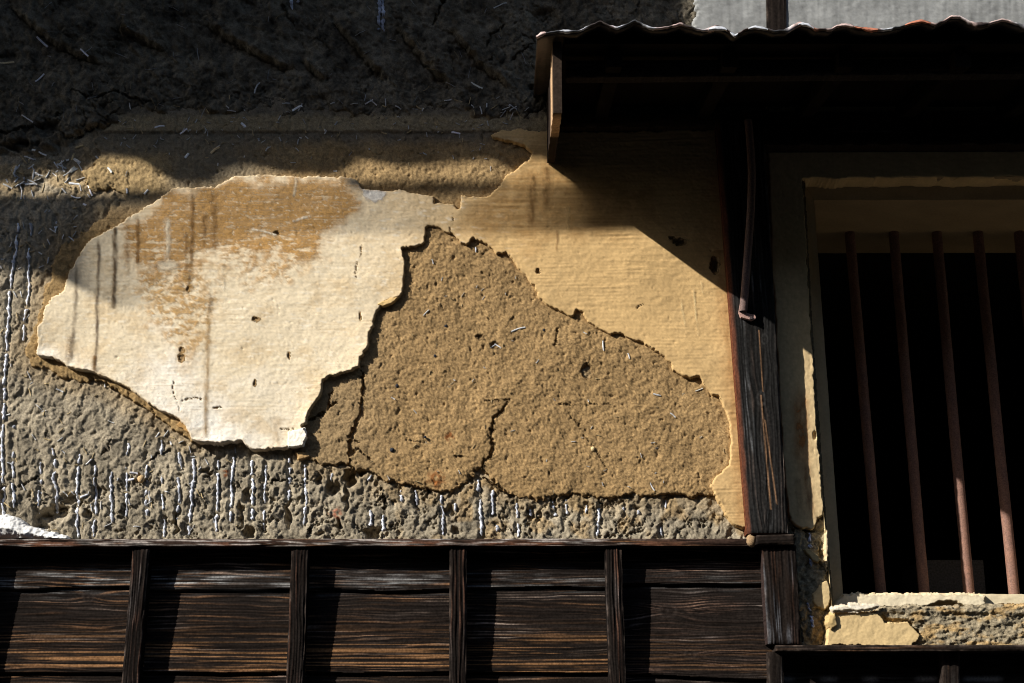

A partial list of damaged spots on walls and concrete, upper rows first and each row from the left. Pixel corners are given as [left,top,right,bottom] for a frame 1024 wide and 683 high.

damp [112,177,360,350]
spalling [25,96,547,443]
crack [281,366,371,472]
crack [454,398,510,493]
spalling [287,227,731,502]
spalling [792,519,1024,645]